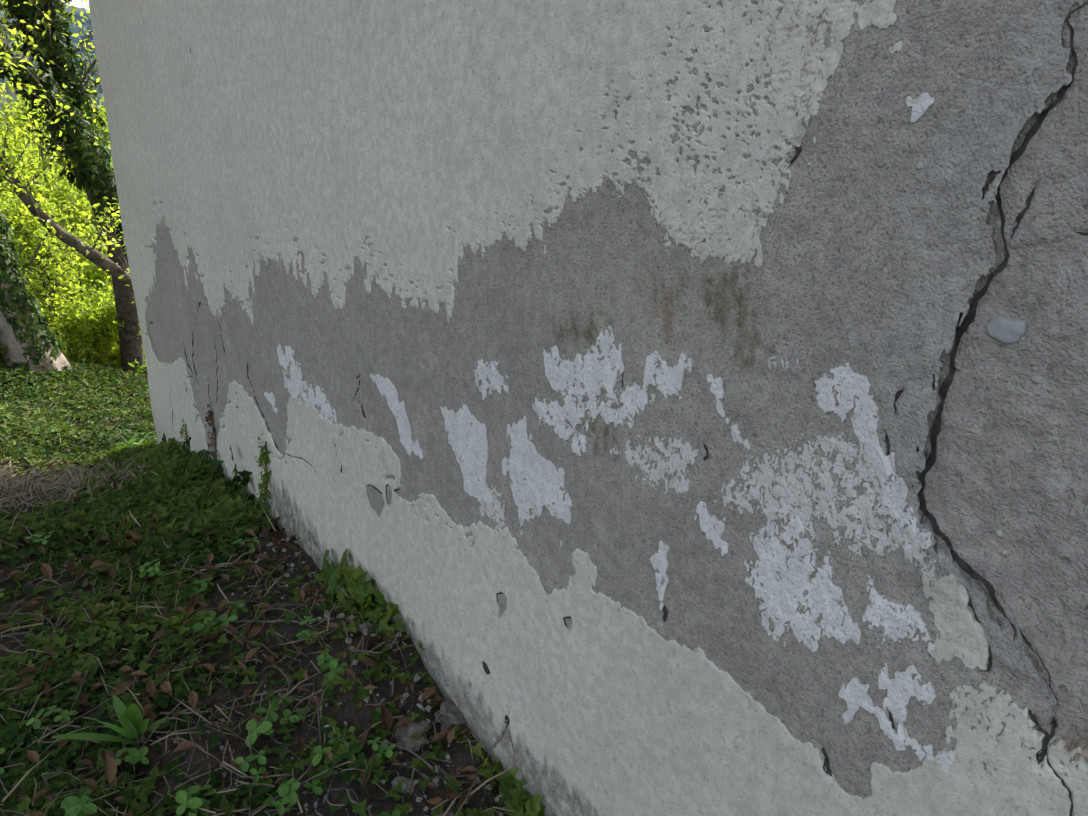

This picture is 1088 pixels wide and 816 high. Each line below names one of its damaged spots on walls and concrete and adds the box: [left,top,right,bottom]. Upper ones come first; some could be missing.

peeling [701,73,727,104]
peeling [670,97,712,163]
crack [885,389,903,456]
crack [918,2,1088,816]
spalling [923,0,1088,752]
peeling [366,483,385,517]
peeling [496,591,507,618]